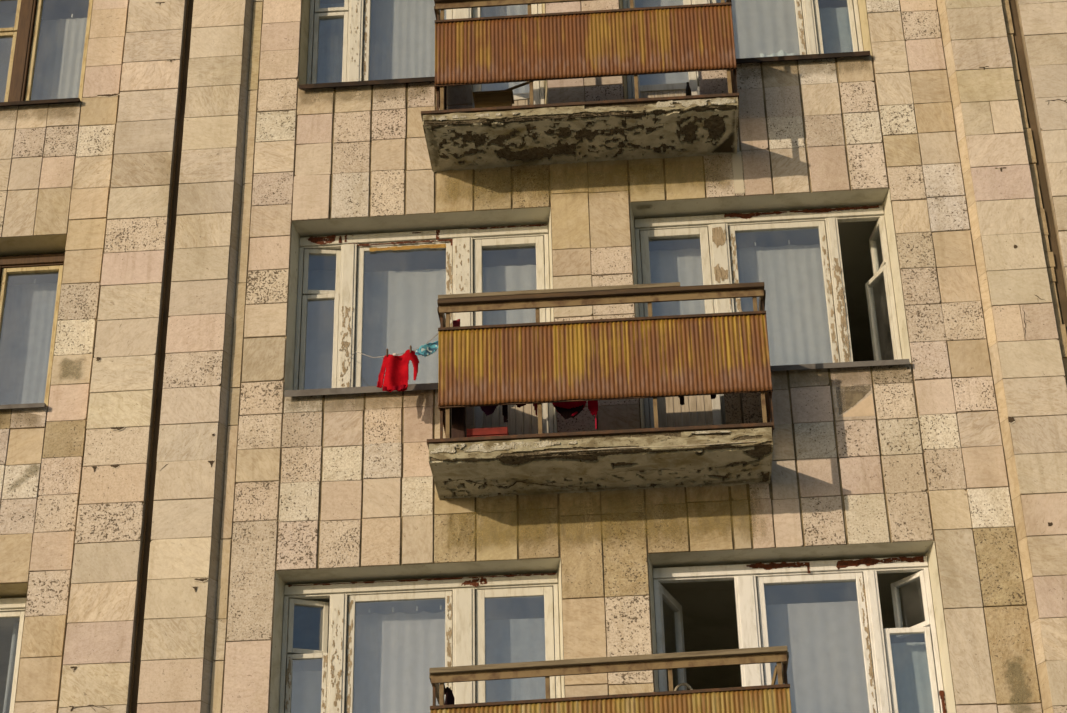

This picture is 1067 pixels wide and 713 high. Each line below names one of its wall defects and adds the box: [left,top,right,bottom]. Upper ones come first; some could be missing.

spalling [424,98,736,163]
peeling [822,235,850,363]
peeling [339,306,353,387]
spalling [430,430,772,487]
corrosion [746,562,811,573]
corrosion [836,556,924,570]